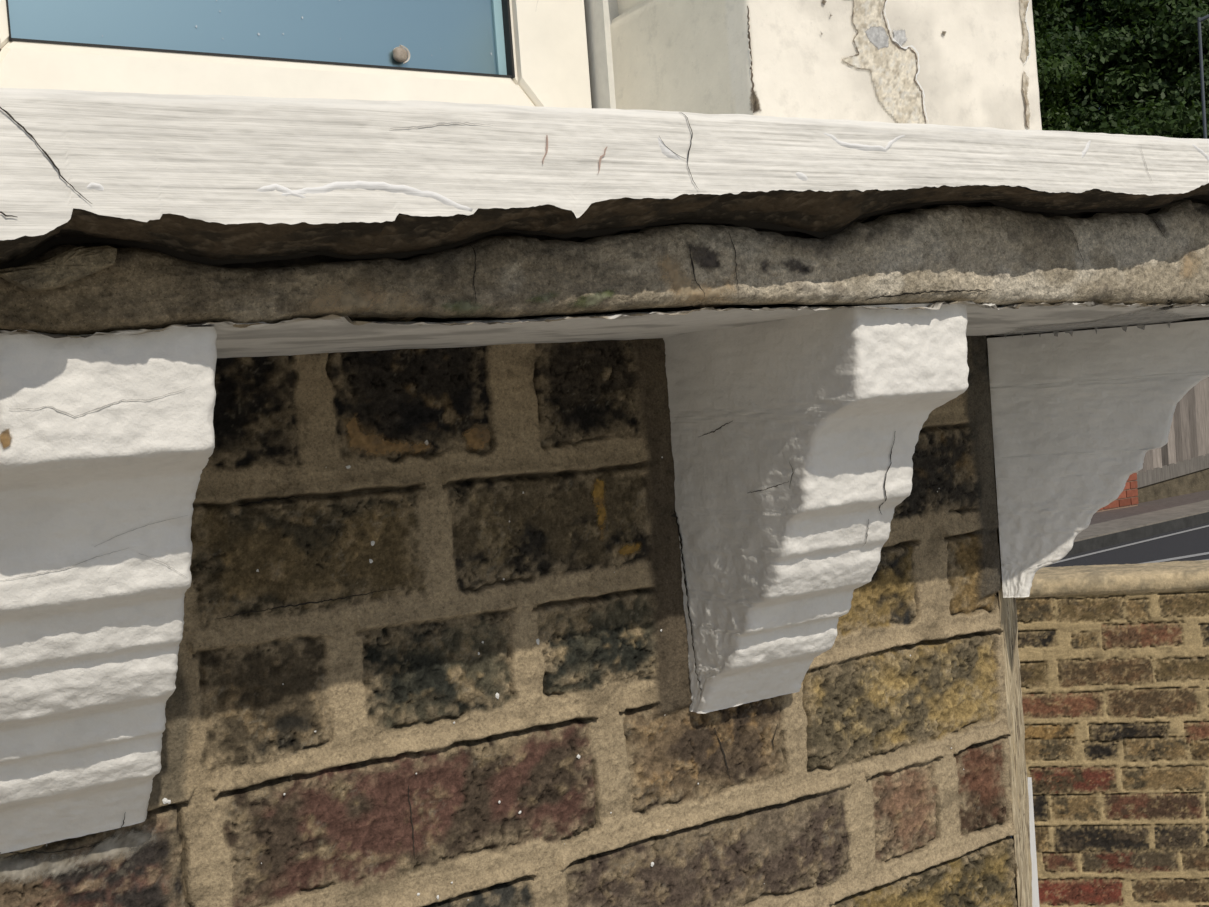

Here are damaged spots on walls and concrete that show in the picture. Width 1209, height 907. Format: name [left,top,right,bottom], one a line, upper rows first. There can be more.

peeling [843,0,929,124]
peeling [1019,0,1031,128]
crack [0,107,92,204]
crack [390,121,493,129]
crack [659,113,698,188]
flaking render [0,183,1209,292]
crack [0,196,1209,303]
crack [1155,294,1209,311]
crack [17,386,191,417]
crack [864,435,895,545]